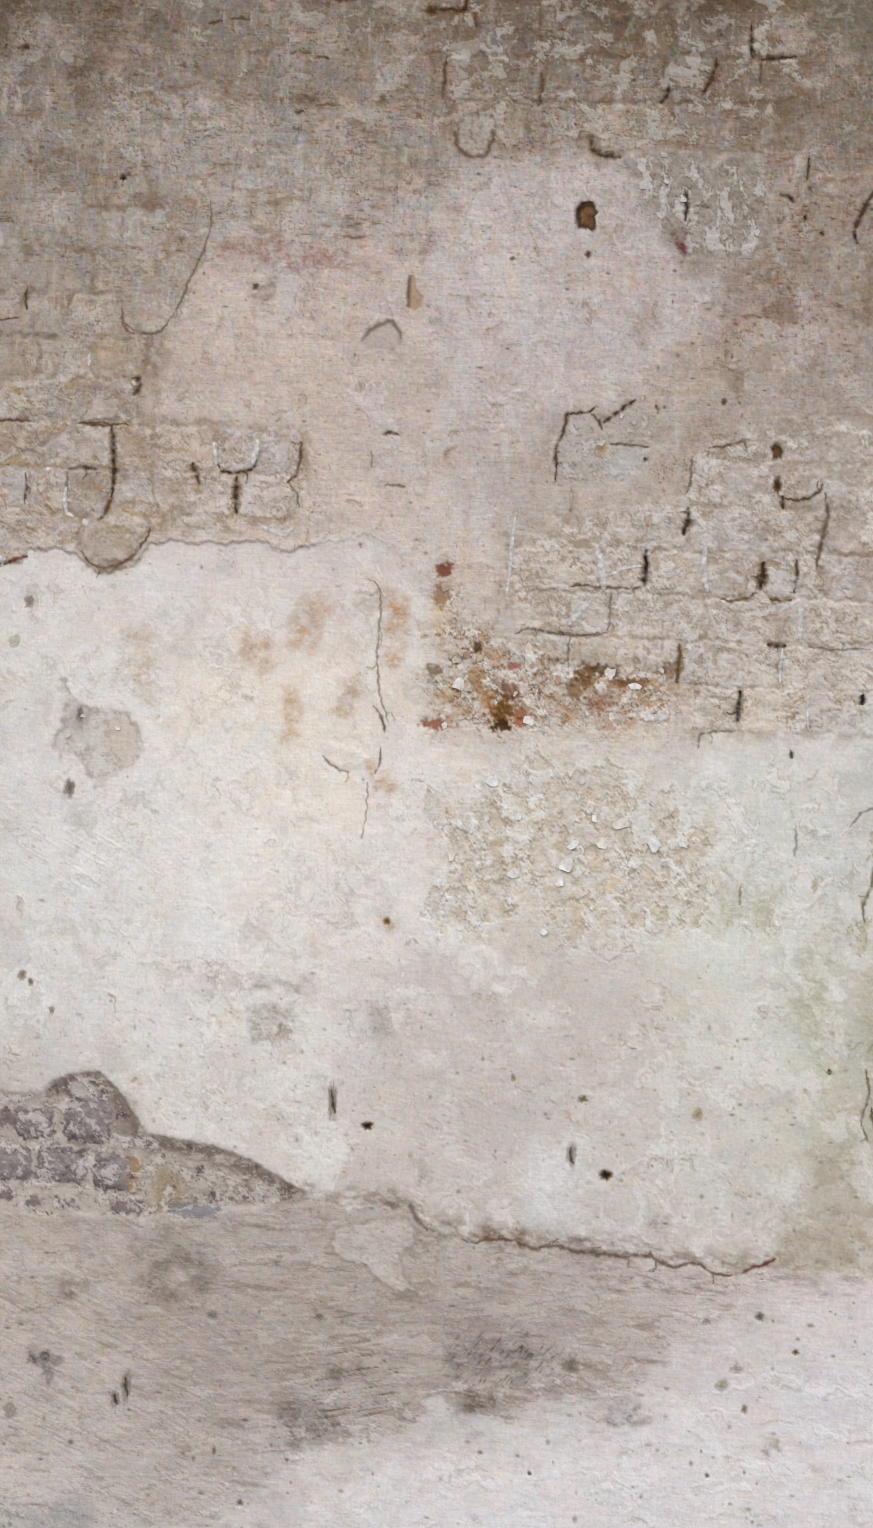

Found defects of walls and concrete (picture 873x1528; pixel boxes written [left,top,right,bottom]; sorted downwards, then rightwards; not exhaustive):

flaking render [455,114,496,158]
flaking render [628,151,773,265]
flaking render [362,320,403,358]
flaking render [407,276,423,313]
flaking render [0,354,312,574]
crack [323,580,394,838]
flaking render [412,398,873,960]
flaking render [0,1073,304,1219]
crack [384,1202,428,1231]
crack [466,1235,775,1283]